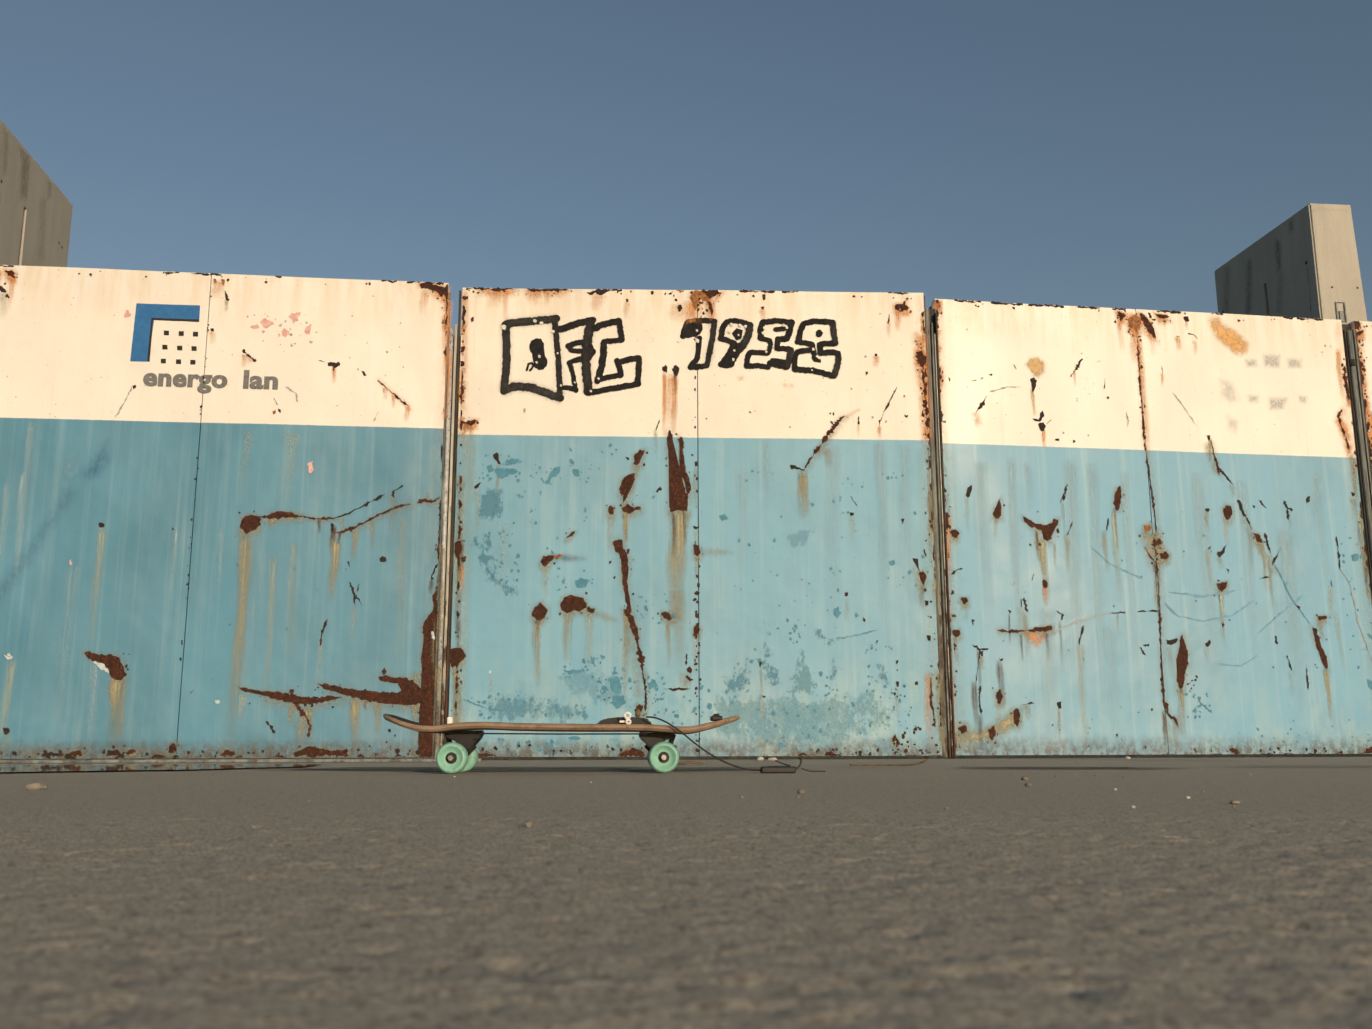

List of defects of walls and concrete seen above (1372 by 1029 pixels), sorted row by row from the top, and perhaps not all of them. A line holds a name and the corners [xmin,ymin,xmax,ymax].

corrosion [0,265,18,299]
corrosion [145,272,246,301]
peeling [246,312,317,347]
corrosion [651,289,798,318]
corrosion [1212,313,1247,352]
corrosion [662,364,696,413]
corrosion [1337,321,1372,483]
corrosion [0,280,632,760]
corrosion [619,449,648,533]
corrosion [888,292,1189,651]
corrosion [665,417,705,715]
corrosion [1176,635,1198,709]